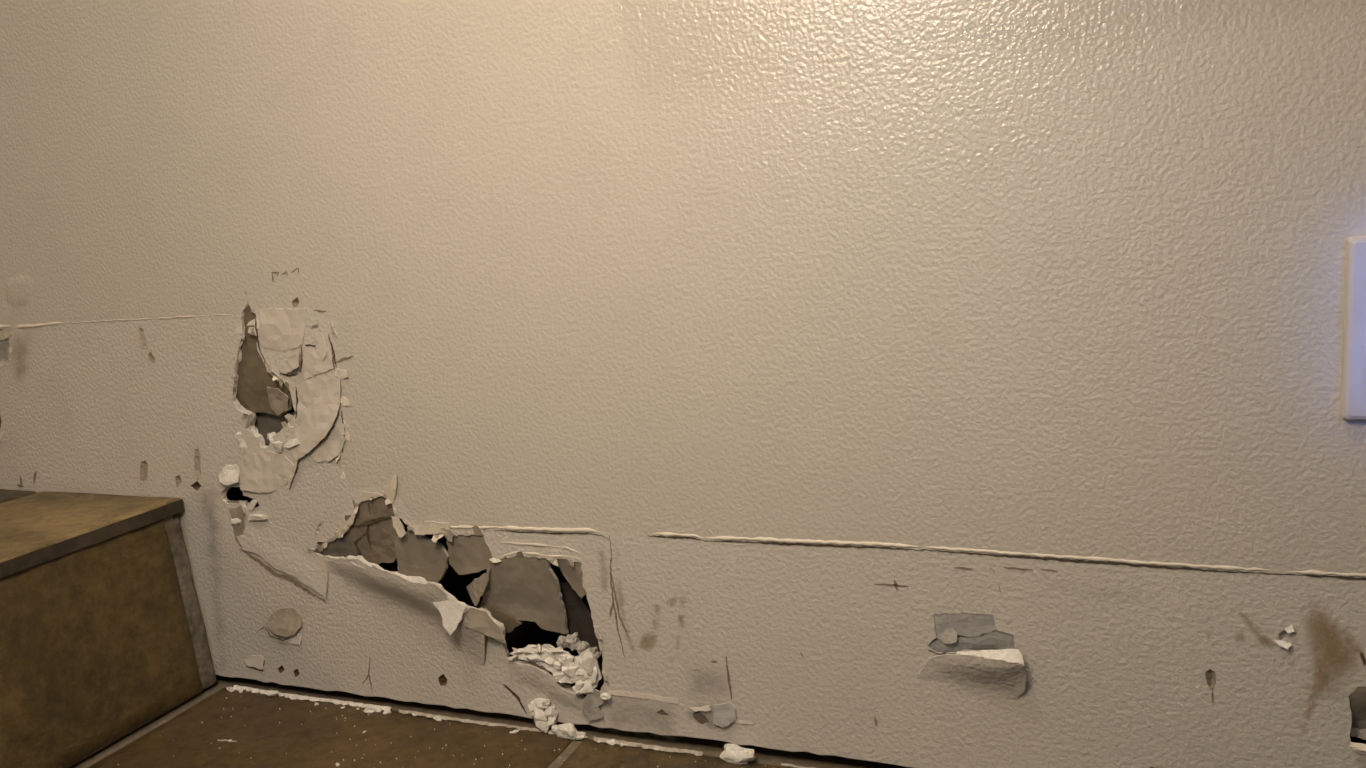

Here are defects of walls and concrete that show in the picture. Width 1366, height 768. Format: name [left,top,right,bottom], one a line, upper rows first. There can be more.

peeling [283,436,300,448]
peeling [433,595,466,636]
spalling [928,613,1024,665]